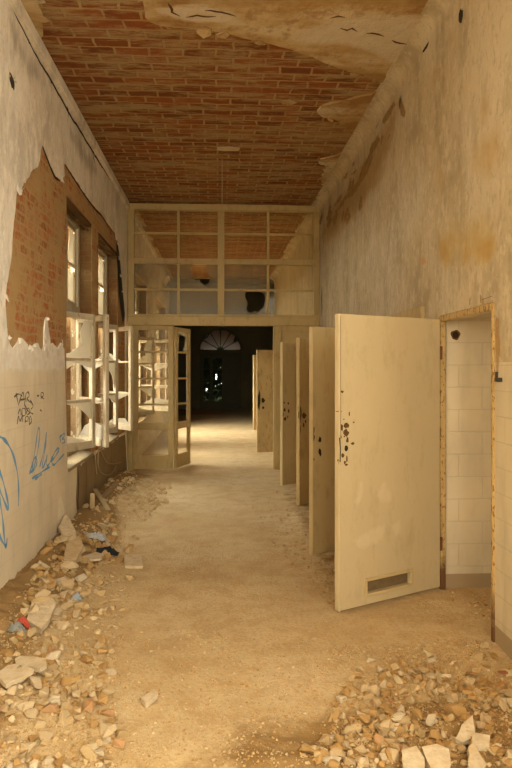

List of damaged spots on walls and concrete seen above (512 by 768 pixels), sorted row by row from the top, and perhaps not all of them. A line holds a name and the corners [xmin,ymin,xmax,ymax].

crack [14,13,110,179]
peeling [5,146,125,423]
flaking render [31,0,423,278]
leakage [434,206,500,275]